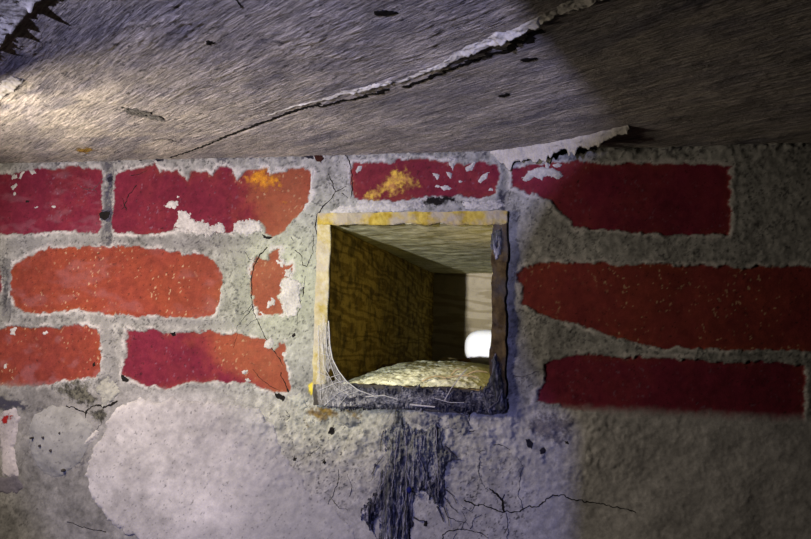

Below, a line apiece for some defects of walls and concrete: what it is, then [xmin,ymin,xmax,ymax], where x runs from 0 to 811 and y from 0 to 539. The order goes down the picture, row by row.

crack [153,29,546,158]
peeling [233,218,273,239]
crack [291,155,353,316]
peeling [432,157,462,190]
peeling [462,188,505,210]
crack [233,247,290,417]
crack [66,401,118,429]
crack [442,444,636,539]